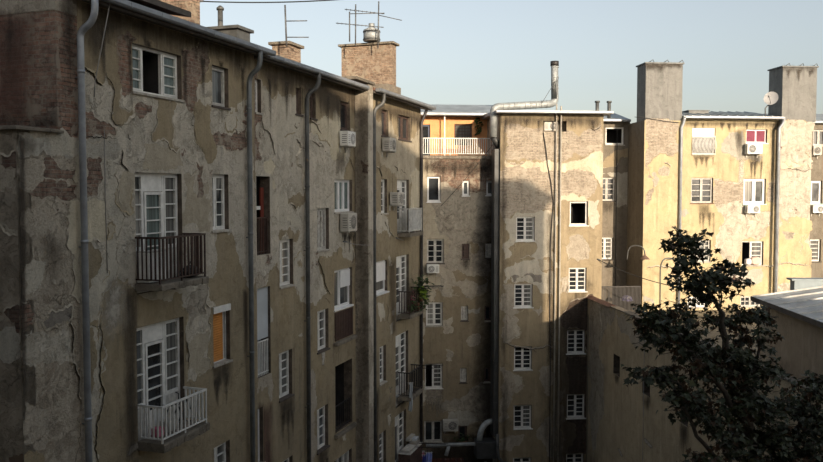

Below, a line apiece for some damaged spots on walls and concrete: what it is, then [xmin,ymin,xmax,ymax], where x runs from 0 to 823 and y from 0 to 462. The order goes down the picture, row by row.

flaking render [645,118,680,205]
peeling [721,131,763,162]
water stain [739,155,762,182]
flaking render [781,119,815,171]
peeling [0,15,355,462]
peeling [361,94,628,454]
peeling [713,177,812,285]
crack [68,316,106,462]